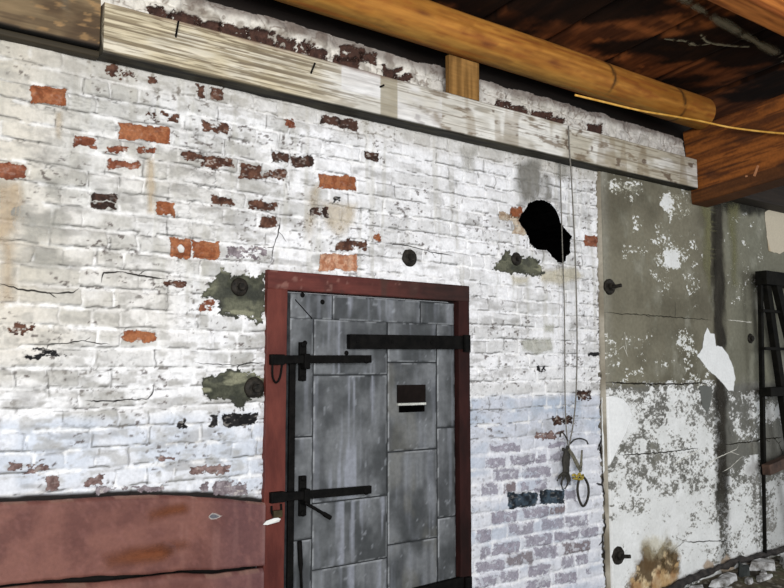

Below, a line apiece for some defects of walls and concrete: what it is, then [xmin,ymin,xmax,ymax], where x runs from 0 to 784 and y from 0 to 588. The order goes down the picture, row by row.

spalling [146,4,413,83]
peeling [181,150,314,181]
spalling [492,200,572,277]
crack [2,284,79,297]
crack [101,271,166,282]
flaking render [169,237,267,325]
crack [45,338,107,351]
crack [85,386,154,402]
flaking render [202,368,264,428]
crack [607,380,706,388]
peeling [588,328,784,588]
rust [629,542,679,588]